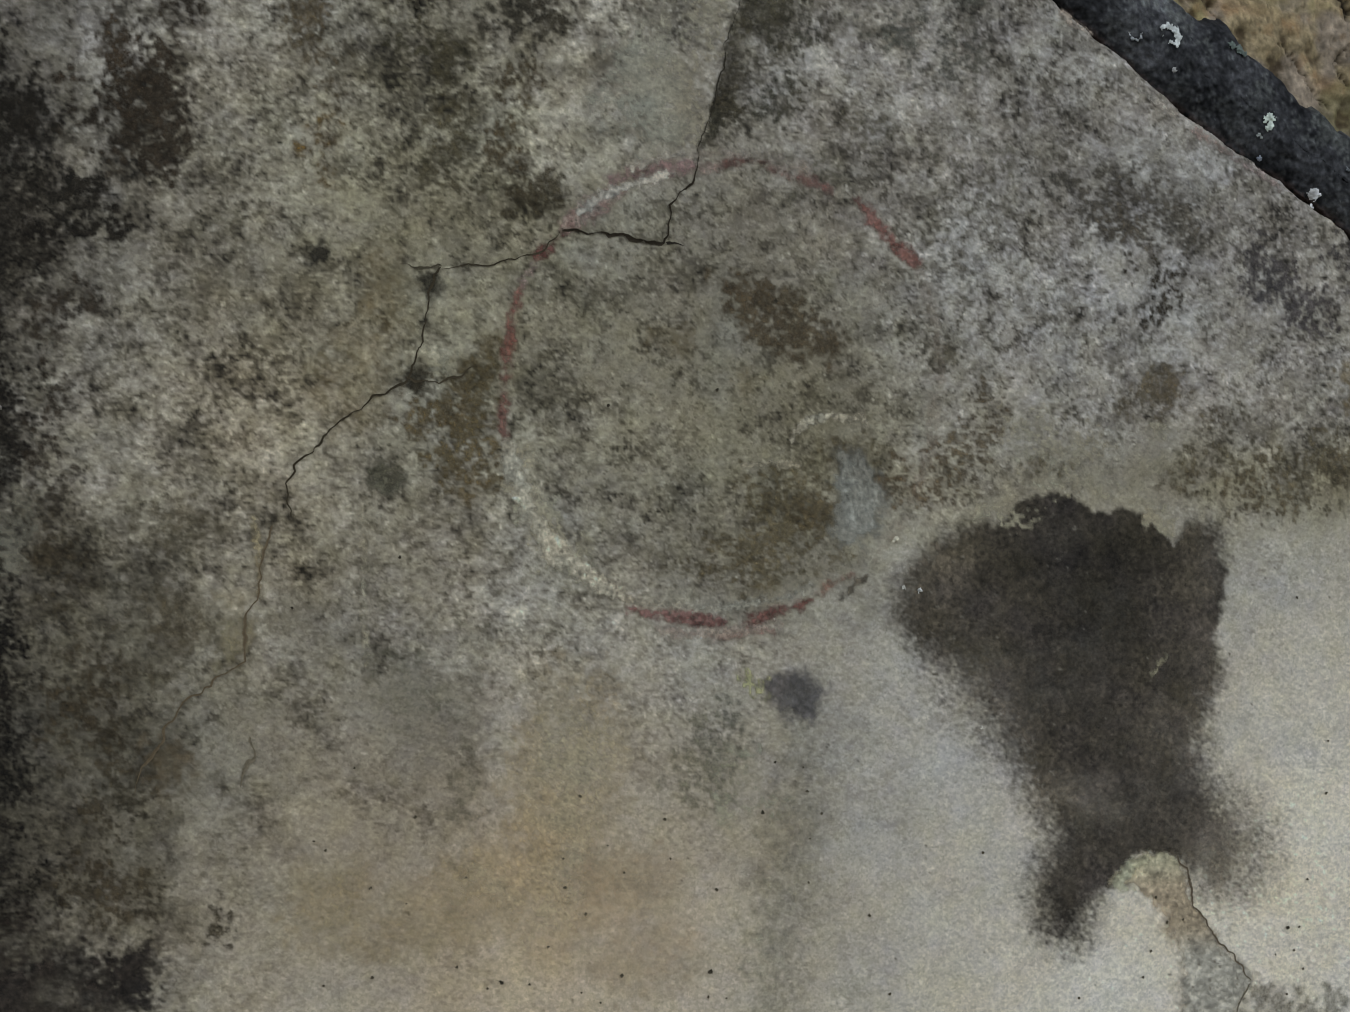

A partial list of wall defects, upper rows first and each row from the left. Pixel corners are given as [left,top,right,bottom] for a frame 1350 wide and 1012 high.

leakage [0,0,217,1012]
leakage [204,894,232,948]
crack [135,2,740,791]
leakage [897,401,1350,950]
leakage [1113,363,1193,425]
crack [1169,851,1251,1012]